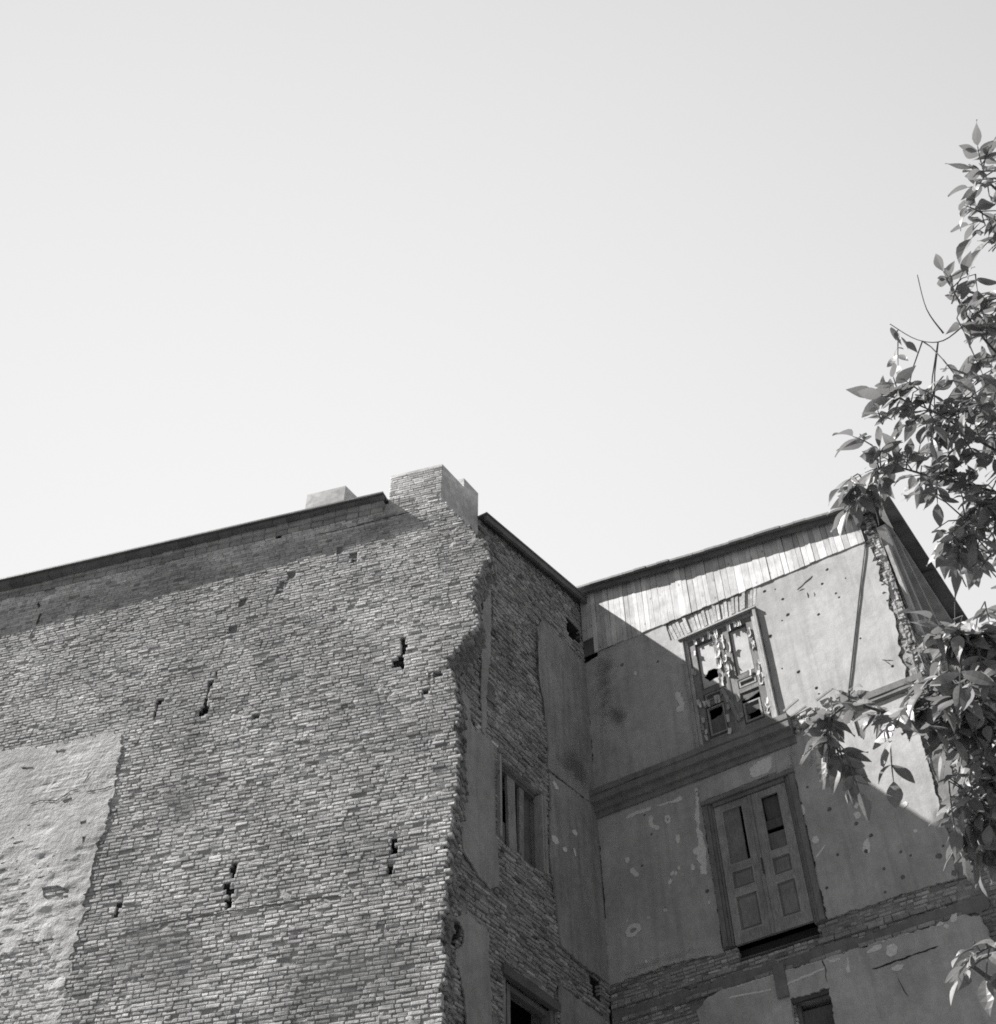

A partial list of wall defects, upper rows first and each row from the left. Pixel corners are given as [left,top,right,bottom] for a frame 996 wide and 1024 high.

spalling [276,571,299,595]
spalling [393,640,408,669]
peeling [750,756,772,778]
peeling [625,796,682,836]
peeling [668,788,707,884]
spalling [388,839,398,875]
peeling [0,731,124,1024]
spalling [224,866,237,909]
crack [873,946,938,993]